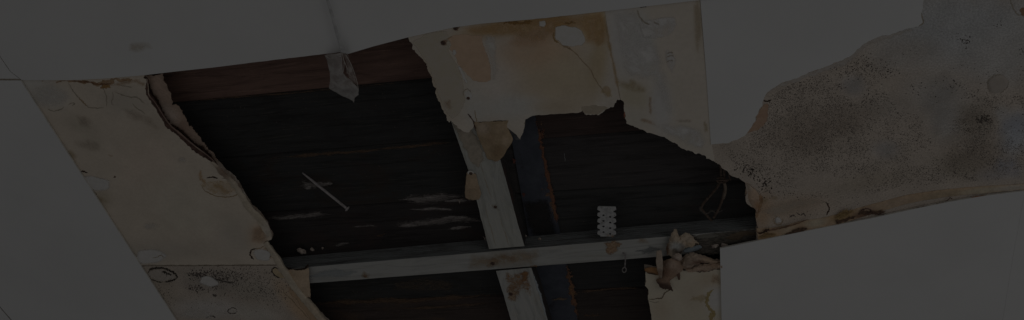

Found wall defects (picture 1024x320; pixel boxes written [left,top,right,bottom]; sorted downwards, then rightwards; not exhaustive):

peeling [413,31,467,119]
leakage [687,53,1024,255]